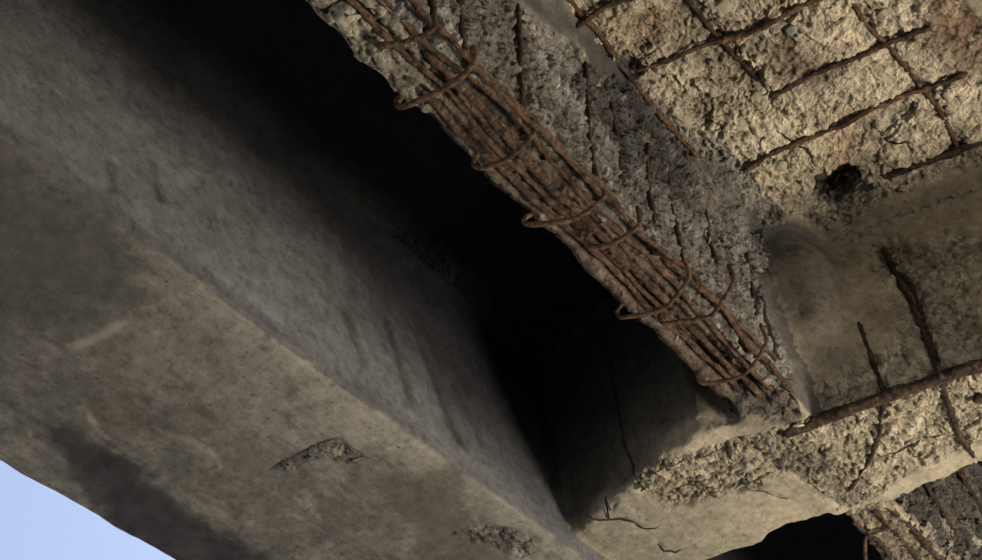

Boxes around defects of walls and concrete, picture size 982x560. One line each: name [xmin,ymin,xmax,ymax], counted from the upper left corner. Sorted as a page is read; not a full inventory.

spalling [308,0,982,560]
spalling [273,439,364,471]
crack [585,496,682,553]
crack [608,340,794,501]